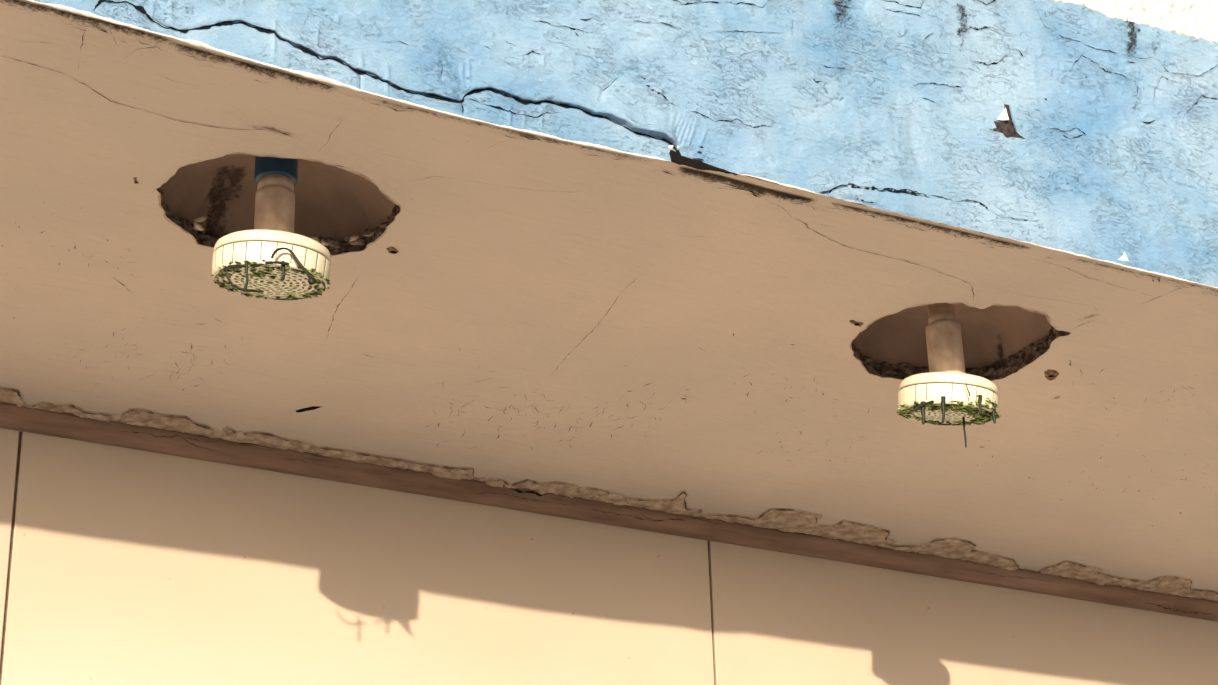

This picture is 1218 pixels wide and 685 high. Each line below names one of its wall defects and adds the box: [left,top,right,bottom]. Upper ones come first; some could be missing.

leakage [831,0,852,36]
crack [910,0,1023,103]
leakage [1126,19,1140,56]
crack [2,0,974,297]
peeling [990,104,1025,139]
spalling [156,153,401,257]
crack [820,183,1032,221]
spalling [849,303,1071,381]
spalling [0,387,1020,571]
spalling [1039,560,1218,602]